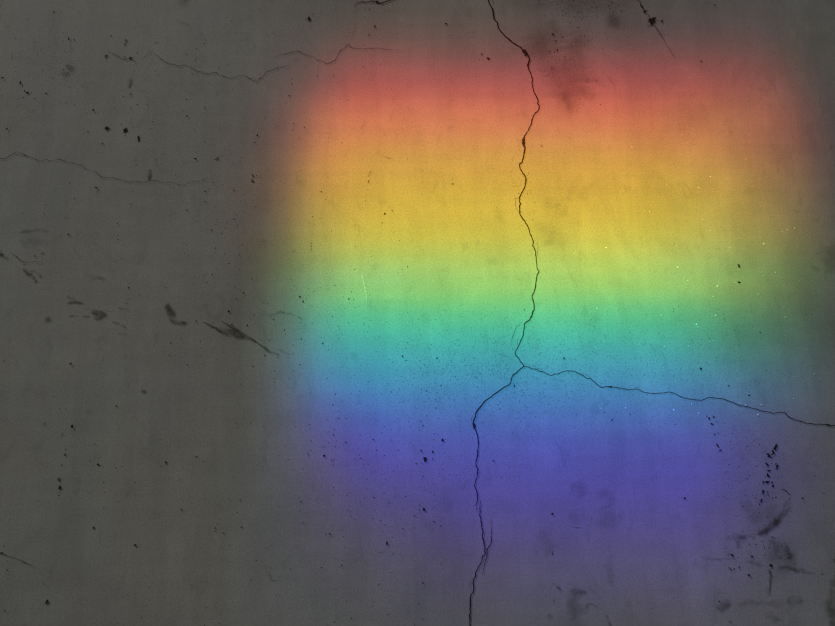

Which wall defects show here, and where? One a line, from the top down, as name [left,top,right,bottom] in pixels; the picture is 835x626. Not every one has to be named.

crack [469,0,835,626]